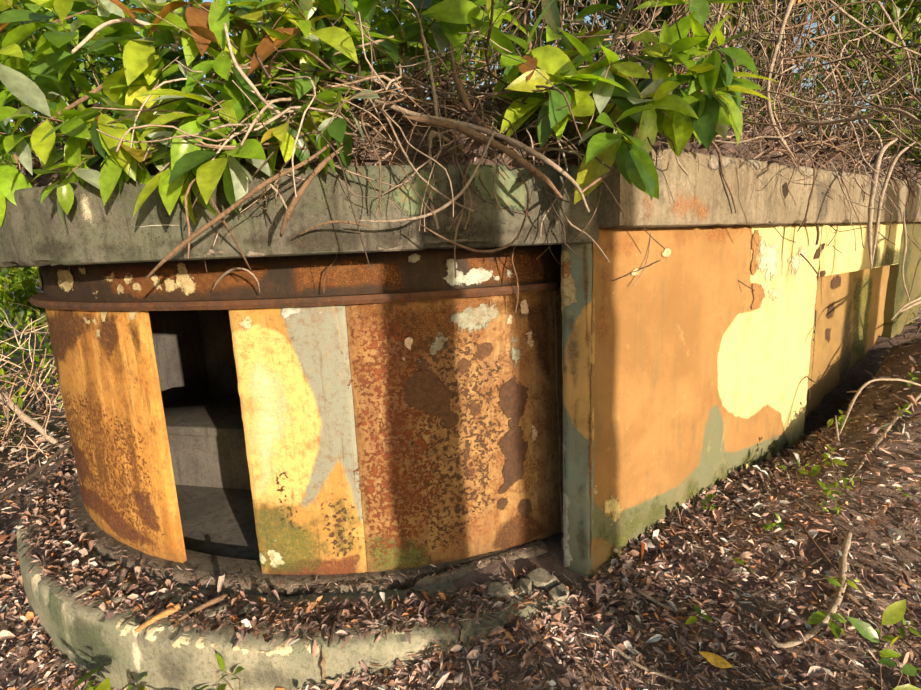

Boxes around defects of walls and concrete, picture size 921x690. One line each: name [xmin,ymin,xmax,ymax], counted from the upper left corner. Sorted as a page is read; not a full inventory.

peeling [57,266,86,292]
peeling [104,273,142,295]
peeling [150,263,196,295]
rust [103,265,268,297]
rust [296,260,401,290]
peeling [442,259,513,286]
rust [468,252,544,284]
peeling [450,300,529,334]
rust [45,310,117,378]
rust [358,297,550,376]
rust [72,444,159,543]
crack [318,644,326,678]